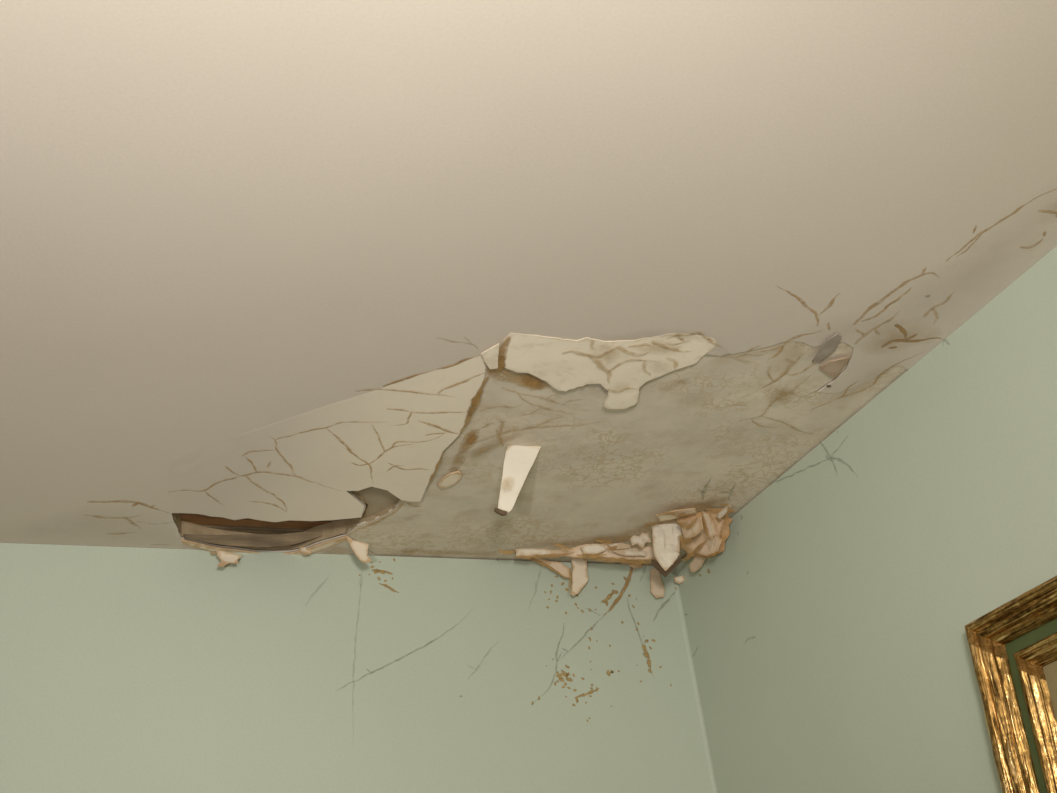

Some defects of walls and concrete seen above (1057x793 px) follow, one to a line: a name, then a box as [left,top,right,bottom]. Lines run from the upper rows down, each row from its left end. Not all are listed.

crack [956,205,1057,254]
crack [182,449,301,508]
crack [301,338,533,481]
flaking render [172,332,908,599]
crack [762,291,834,416]
crack [814,270,941,409]
crack [604,567,633,615]